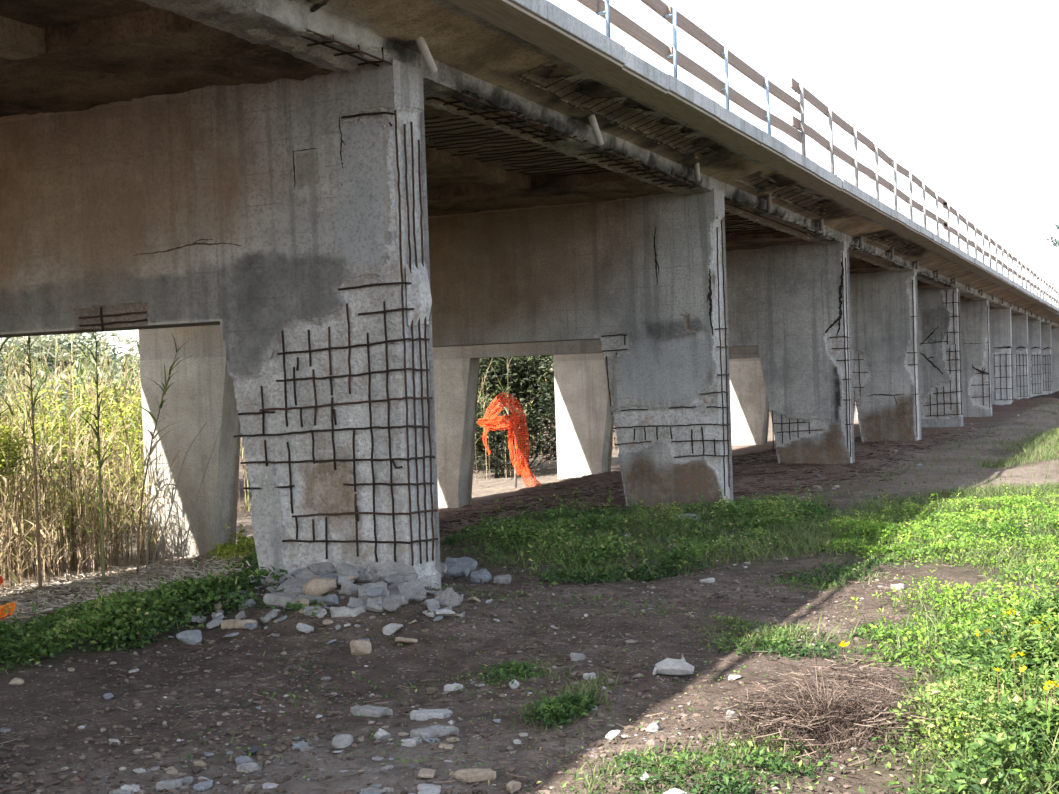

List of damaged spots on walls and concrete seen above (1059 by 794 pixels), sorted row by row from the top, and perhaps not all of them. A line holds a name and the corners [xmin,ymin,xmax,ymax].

crack [290,0,328,12]
crack [134,239,242,256]
crack [652,227,660,285]
spalling [230,92,697,578]
spalling [593,200,828,502]
crack [825,262,844,336]
spalling [771,246,1052,463]
crack [920,326,947,374]